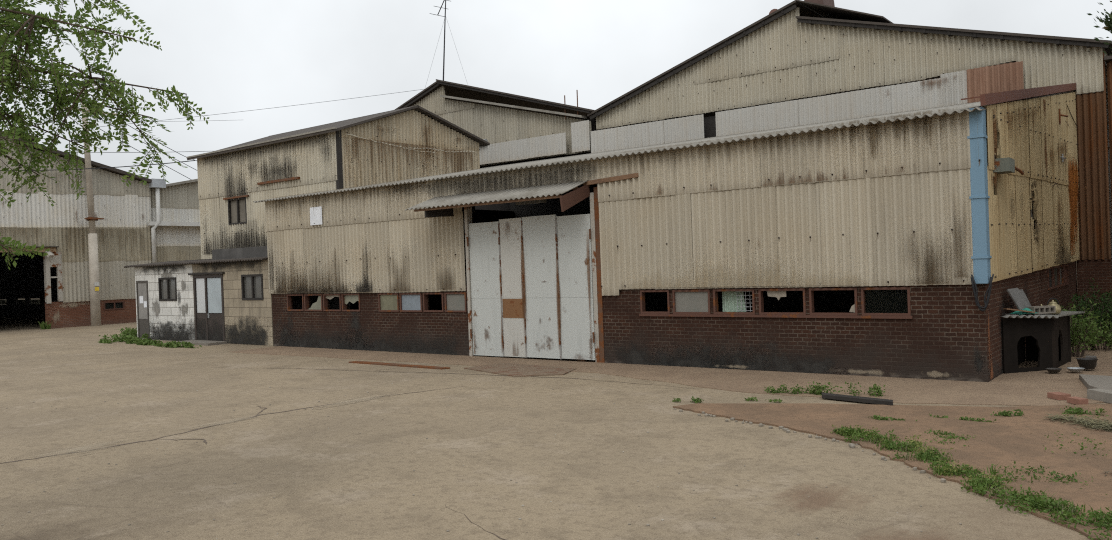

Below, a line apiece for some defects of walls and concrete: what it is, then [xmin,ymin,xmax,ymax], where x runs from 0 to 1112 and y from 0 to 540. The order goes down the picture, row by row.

corrosion [1068,163,1078,248]